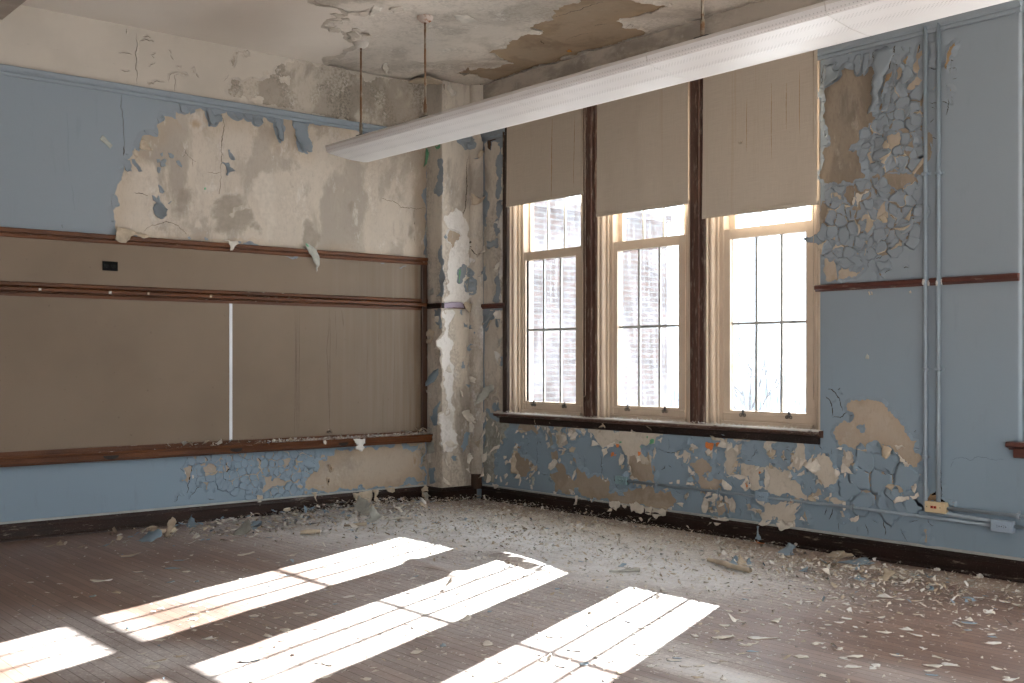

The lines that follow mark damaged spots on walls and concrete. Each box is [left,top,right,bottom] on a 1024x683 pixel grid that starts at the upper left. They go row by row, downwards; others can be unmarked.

crack [121,33,140,156]
water stain [164,167,281,243]
peeling [108,0,957,546]